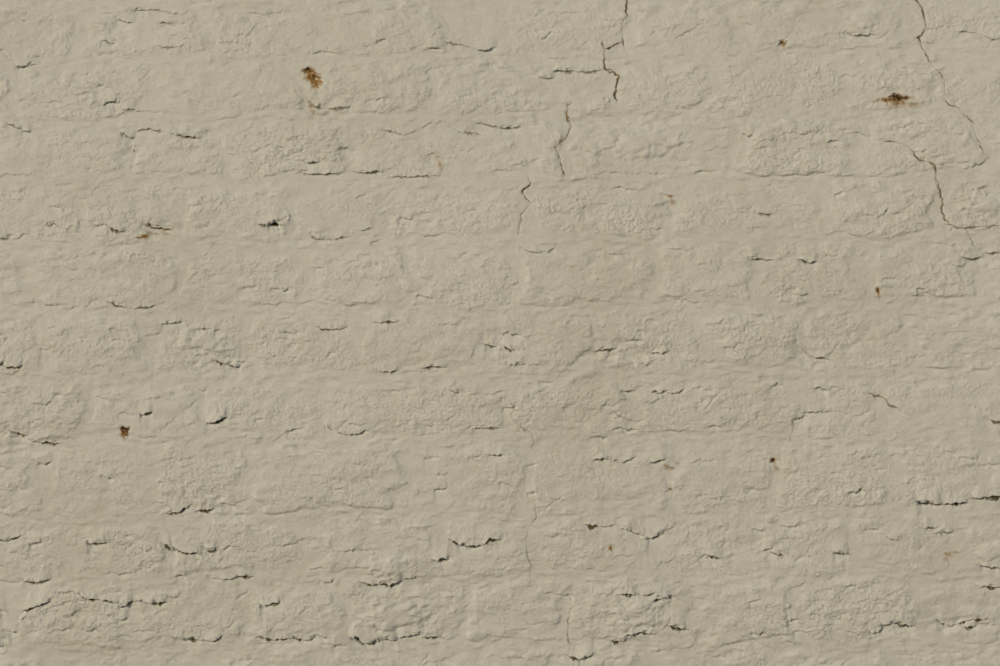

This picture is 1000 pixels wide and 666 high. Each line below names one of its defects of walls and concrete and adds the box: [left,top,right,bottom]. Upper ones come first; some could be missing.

rust [303,68,322,87]
crack [601,0,628,101]
crack [916,0,983,150]
crack [914,154,997,230]